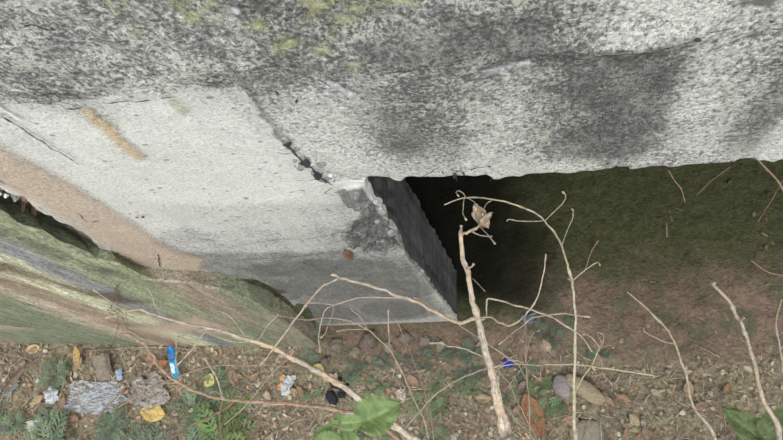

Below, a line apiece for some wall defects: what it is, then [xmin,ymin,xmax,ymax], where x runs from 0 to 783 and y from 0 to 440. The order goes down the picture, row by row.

crack [0,115,78,164]
corrosion [79,109,149,162]
crack [277,139,362,196]
spalling [338,189,399,256]